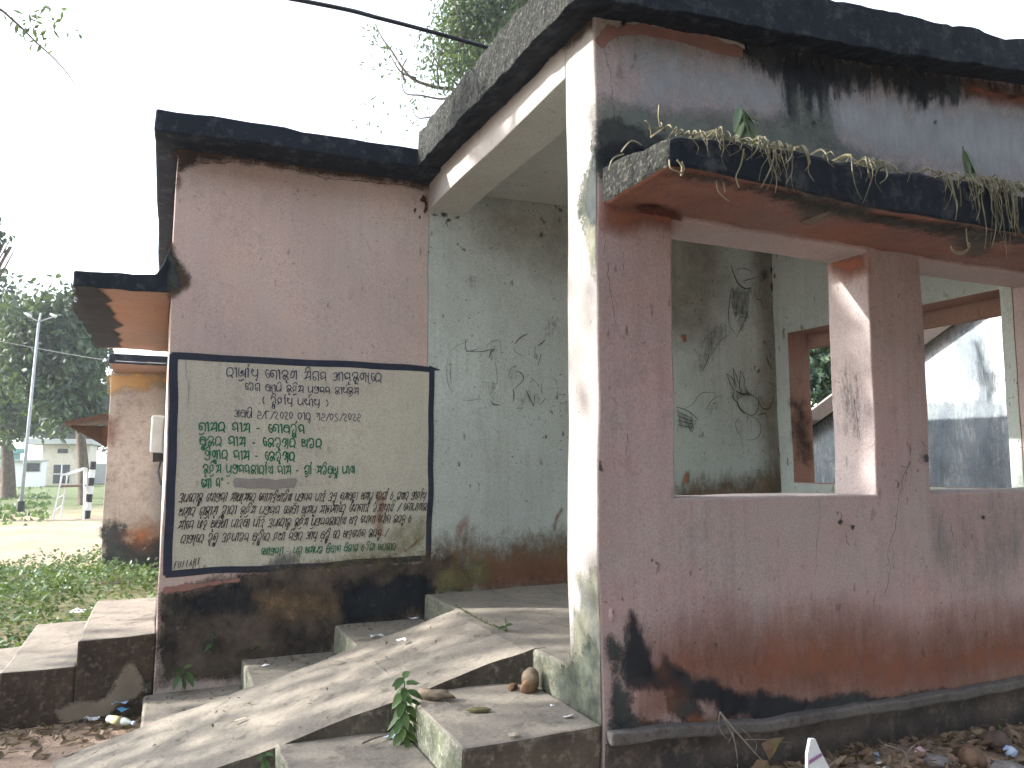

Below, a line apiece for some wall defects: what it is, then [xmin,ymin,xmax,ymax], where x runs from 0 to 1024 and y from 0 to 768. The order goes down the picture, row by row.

water stain [591,42,1024,177]
water stain [586,223,596,277]
water stain [669,173,1024,244]
water stain [98,521,160,572]
water stain [155,551,474,687]
water stain [604,610,944,730]